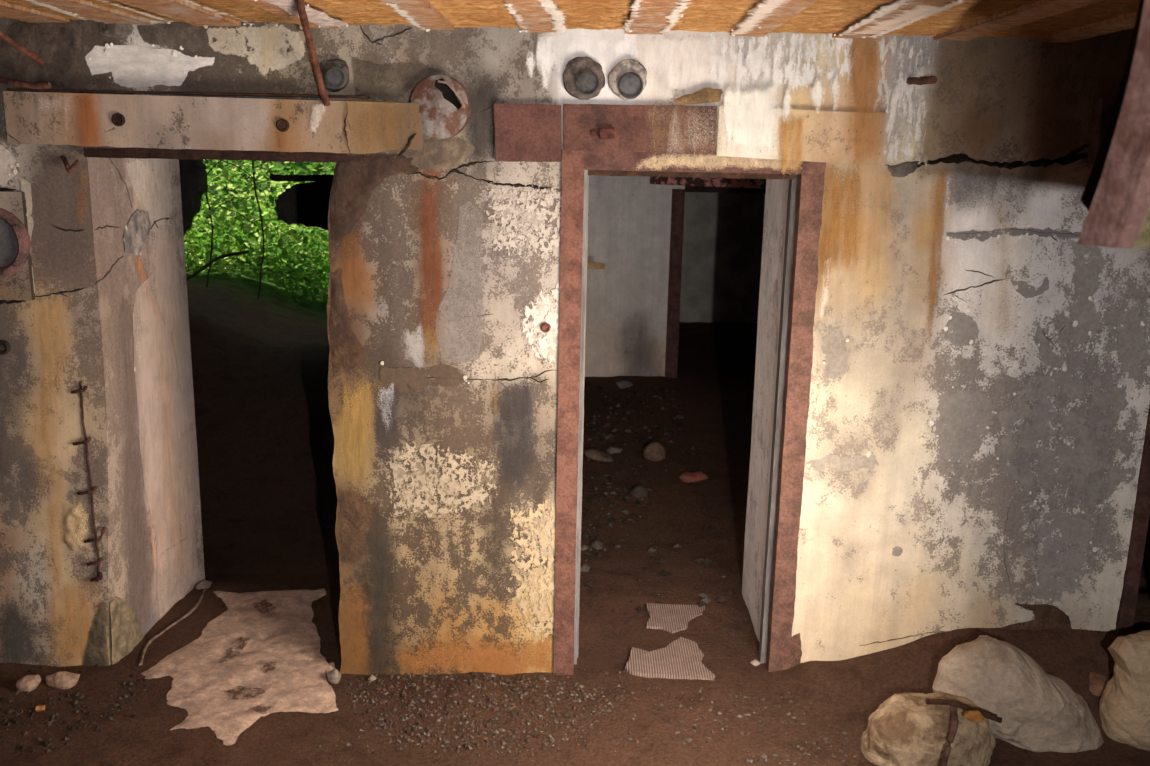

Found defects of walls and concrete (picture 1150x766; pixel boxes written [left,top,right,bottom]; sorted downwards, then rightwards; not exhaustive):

rust [846,37,885,169]
crack [398,103,560,190]
crack [887,145,1089,173]
rust [418,146,447,367]
crack [945,270,1009,301]
crack [961,229,1080,242]
crack [419,370,558,383]
damp [370,382,403,466]